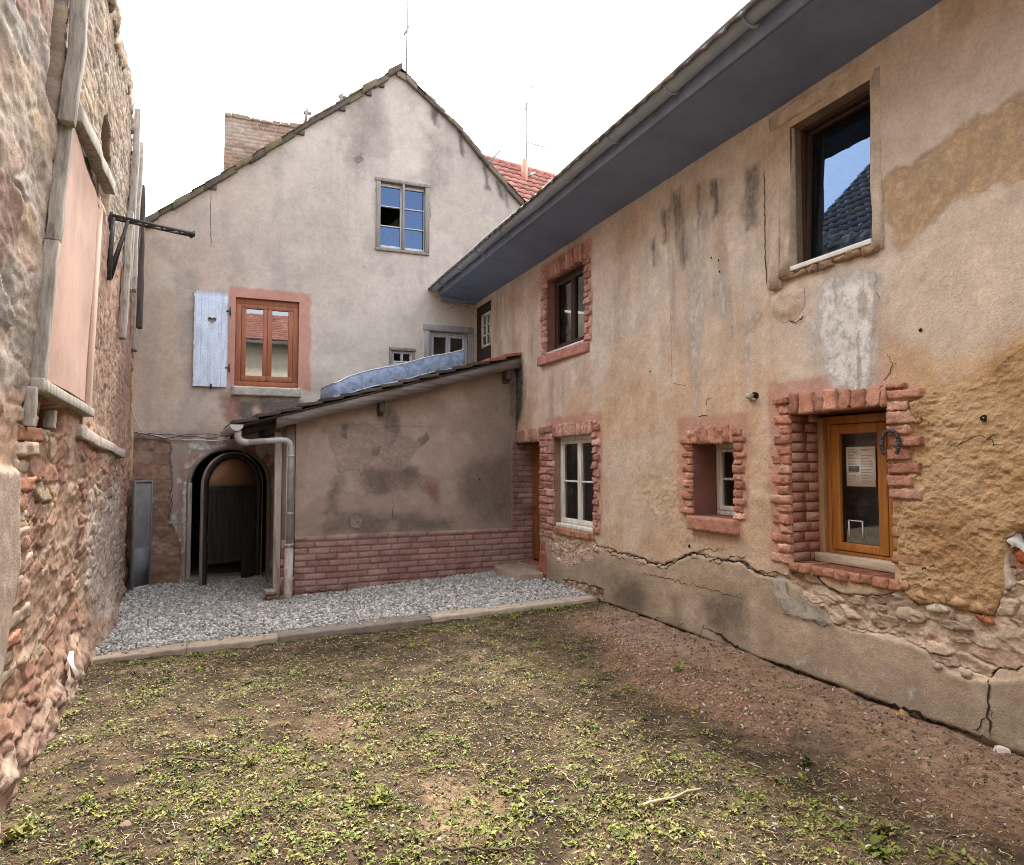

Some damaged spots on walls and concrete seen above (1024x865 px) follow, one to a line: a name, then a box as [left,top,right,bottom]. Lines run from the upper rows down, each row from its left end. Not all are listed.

water stain [699,181,718,214]
peeling [812,270,886,405]
crack [947,433,1005,449]
flaking render [784,339,1024,678]
flaking render [549,531,604,600]
crack [601,548,782,601]